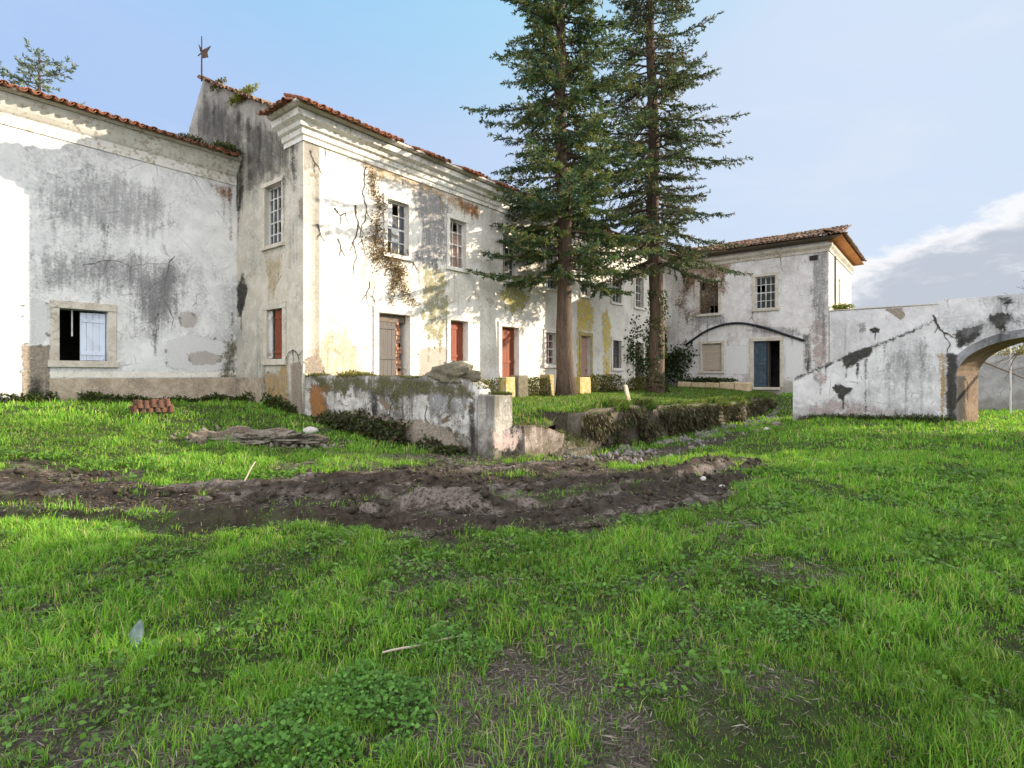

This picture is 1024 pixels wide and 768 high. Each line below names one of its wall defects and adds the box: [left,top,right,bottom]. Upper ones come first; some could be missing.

damp [196,91,297,232]
spalling [21,296,52,401]
damp [45,255,176,322]
peeling [164,312,241,380]
damp [220,274,248,377]
spalling [254,355,326,414]
damp [753,253,830,370]
damp [809,311,1014,424]
crack [932,315,965,353]